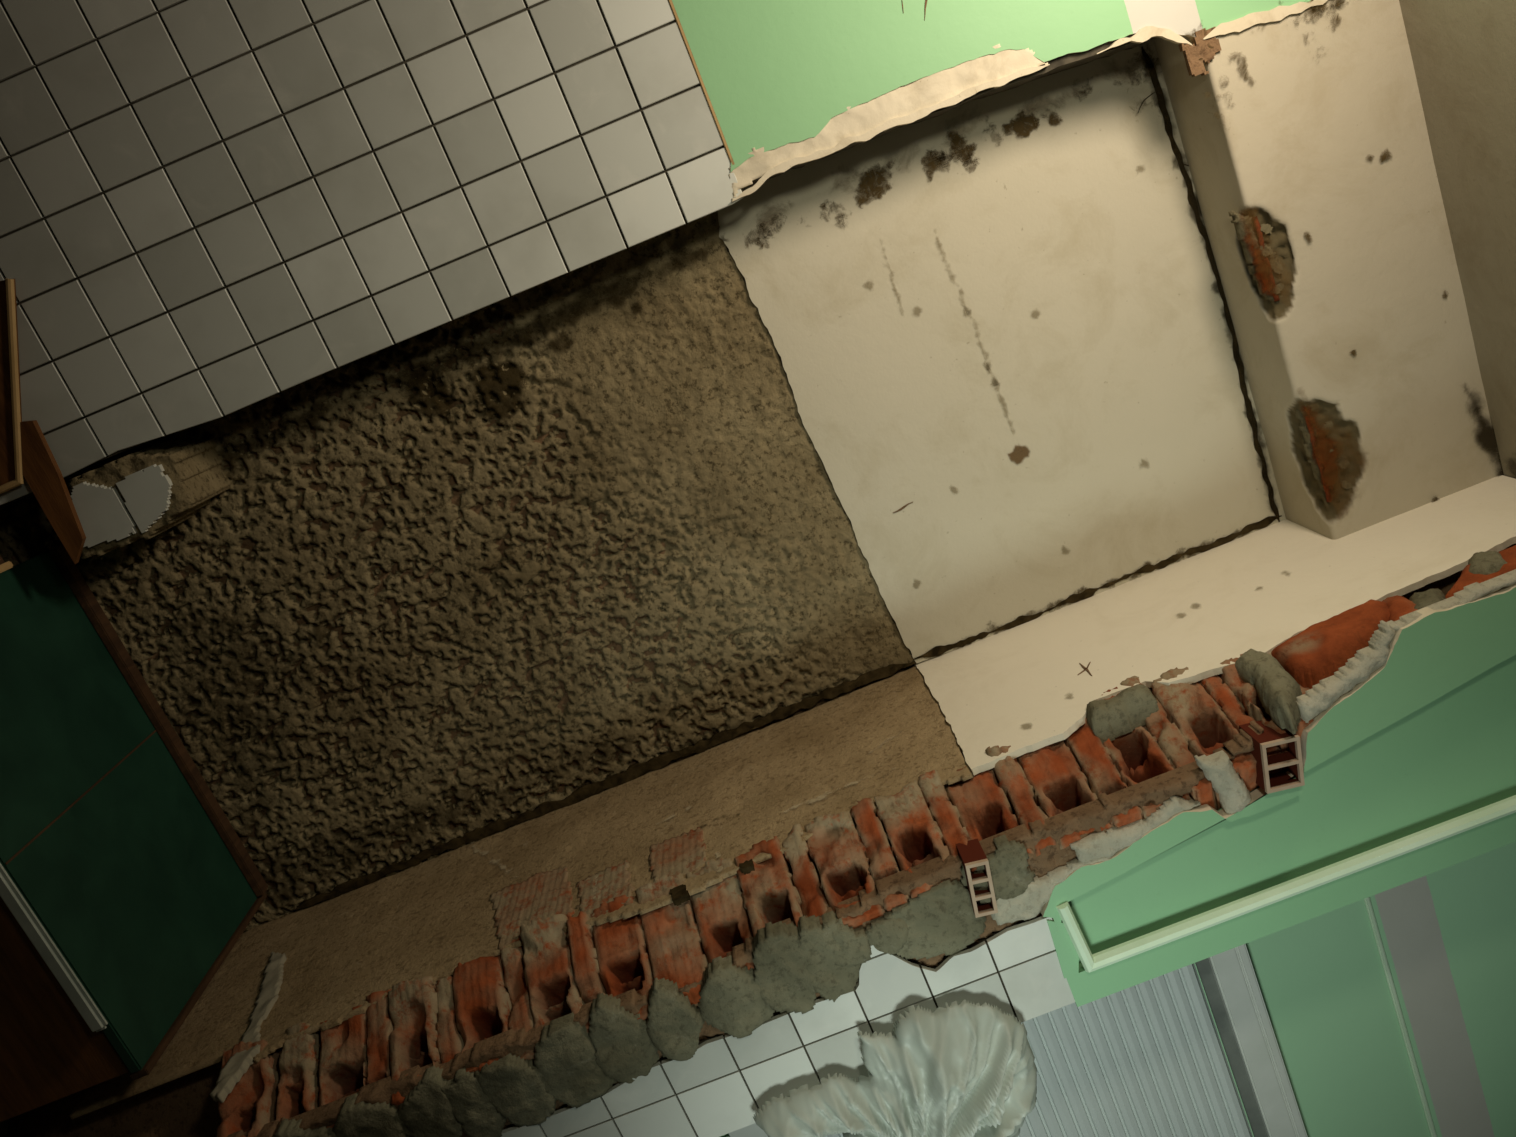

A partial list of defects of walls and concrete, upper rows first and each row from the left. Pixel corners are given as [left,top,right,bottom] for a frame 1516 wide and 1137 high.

leakage [820,162,891,226]
flaking render [728,44,1050,202]
leakage [922,131,977,181]
leakage [992,108,1062,138]
spalling [1228,211,1285,303]
leakage [382,275,647,418]
crack [296,47,1282,910]
spalling [210,545,1516,1137]